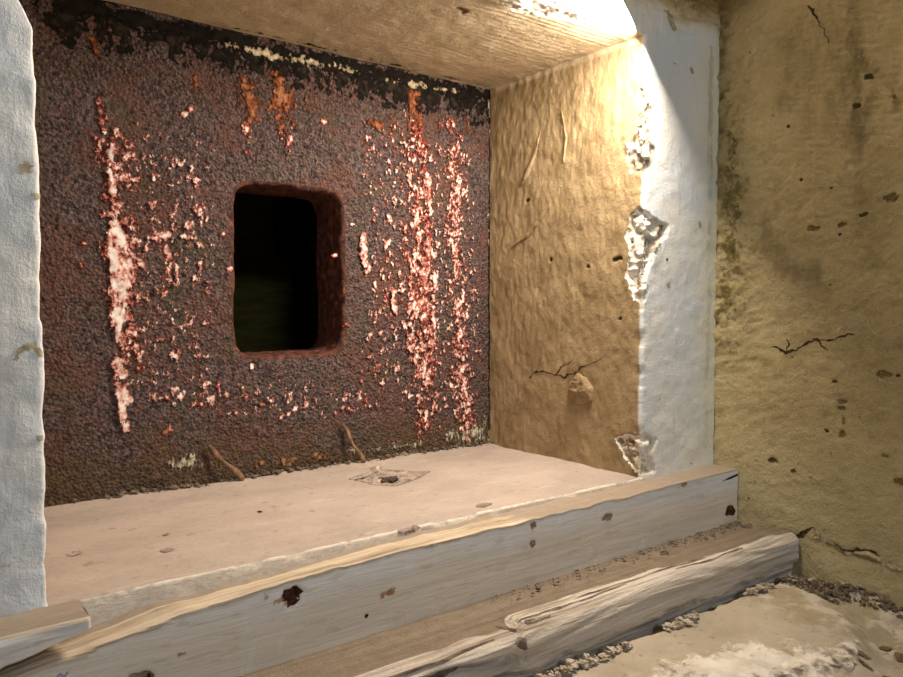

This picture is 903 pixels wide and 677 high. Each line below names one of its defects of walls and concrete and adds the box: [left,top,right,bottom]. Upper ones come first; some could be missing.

peeling [32,0,491,136]
corrosion [234,70,311,160]
flaking render [625,88,655,175]
corrosion [93,95,179,433]
corrosion [359,231,371,277]
corrosion [363,89,478,443]
flaking render [613,207,668,308]
crack [529,358,602,379]
crack [773,333,854,354]
flaking render [615,433,656,477]
crack [796,527,814,538]
corrosion [274,586,303,607]